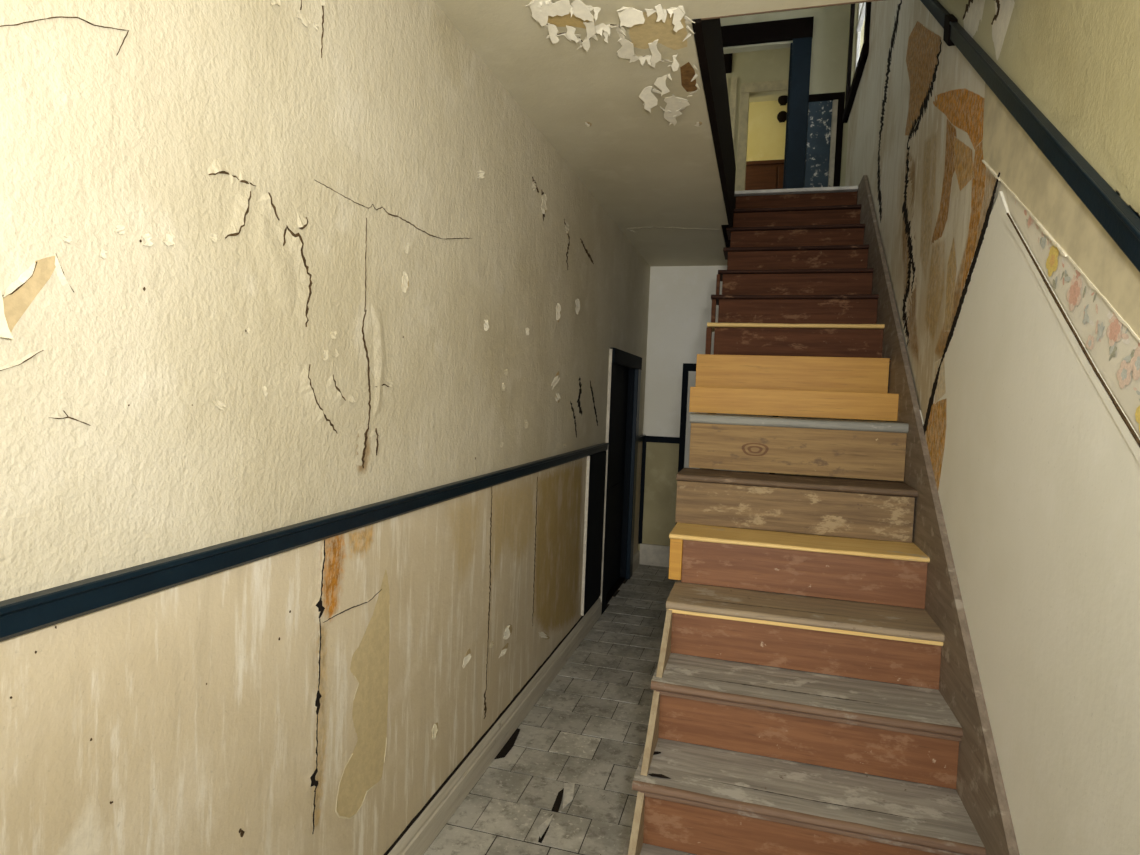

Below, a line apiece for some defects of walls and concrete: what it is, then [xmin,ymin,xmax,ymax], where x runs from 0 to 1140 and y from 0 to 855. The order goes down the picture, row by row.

crack [0,16,129,56]
peeling [525,0,702,126]
peeling [904,21,942,137]
crack [0,349,43,371]
peeling [0,253,74,339]
crack [48,410,91,431]
crack [207,159,312,327]
crack [299,180,472,468]
peeling [925,358,947,490]
crack [305,540,382,835]
peeling [335,570,390,820]